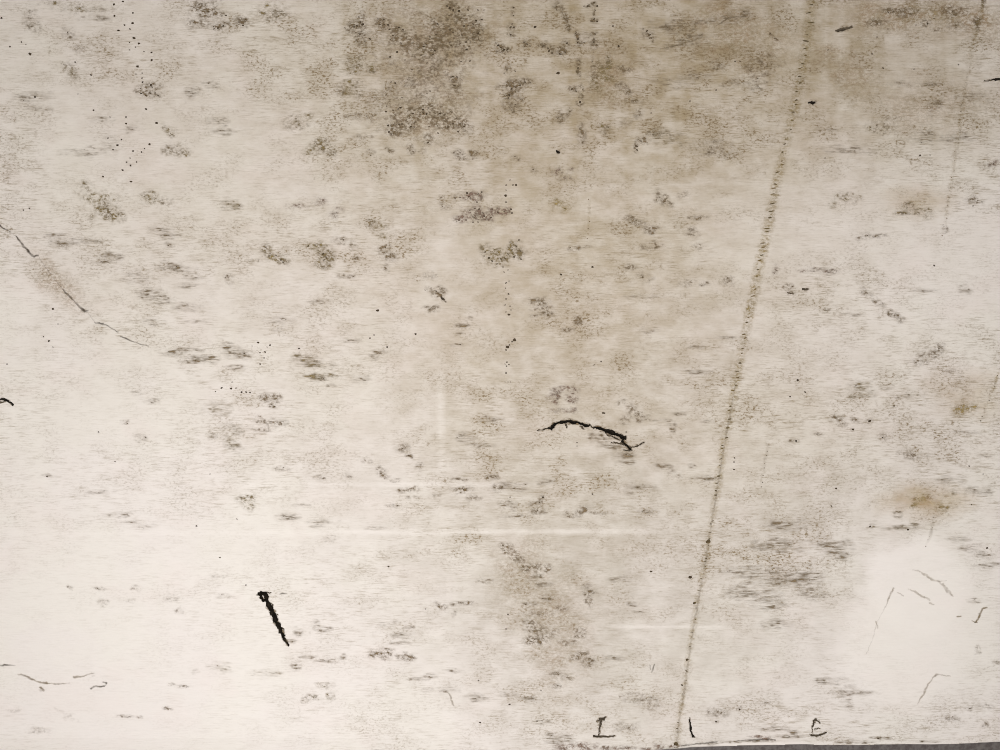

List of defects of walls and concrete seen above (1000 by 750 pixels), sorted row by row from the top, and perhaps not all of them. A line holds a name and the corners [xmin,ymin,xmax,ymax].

leakage [344,1,483,70]
leakage [523,2,598,55]
leakage [385,82,466,143]
leakage [502,67,531,113]
leakage [454,191,513,223]
leakage [480,239,523,268]